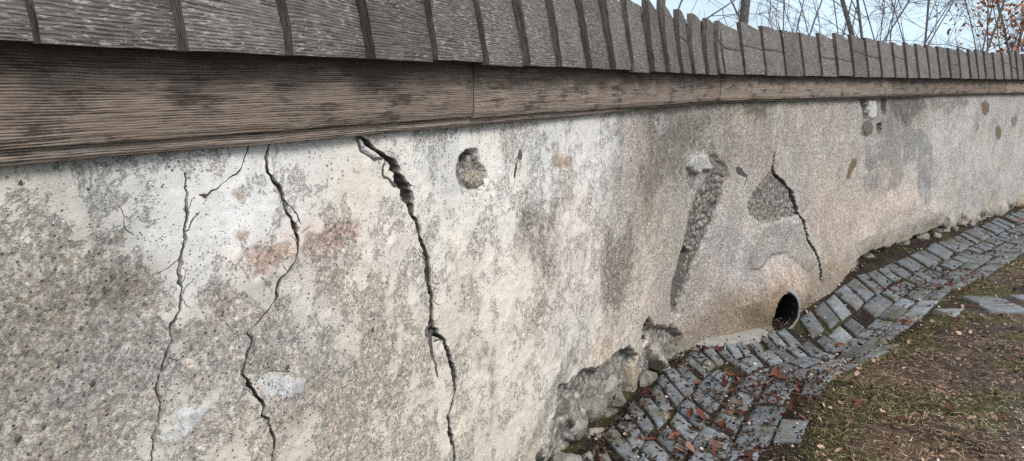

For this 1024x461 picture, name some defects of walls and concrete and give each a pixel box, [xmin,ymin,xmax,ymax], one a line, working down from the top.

spalling [456,149,484,190]
spalling [642,115,724,311]
spalling [747,172,795,223]
crack [736,152,823,281]
crack [150,144,309,461]
crack [354,136,457,461]
spalling [535,319,682,461]